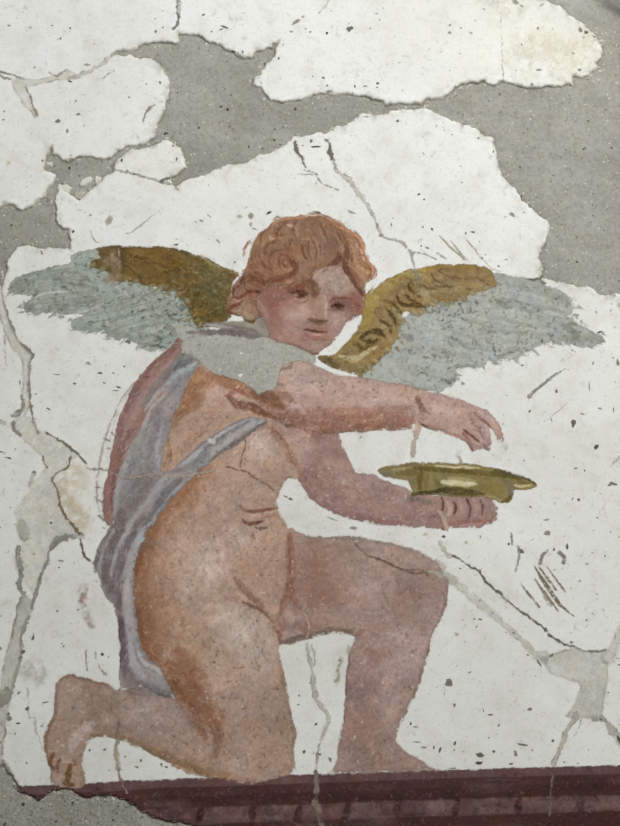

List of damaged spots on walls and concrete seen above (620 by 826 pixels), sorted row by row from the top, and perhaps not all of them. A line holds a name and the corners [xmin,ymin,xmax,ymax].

crack [0,56,112,117]
spalling [0,0,620,307]
crack [293,140,436,285]
spalling [170,324,316,395]
crack [169,437,274,490]
crack [411,396,425,457]
crack [0,286,146,794]
crack [355,501,620,664]
crack [546,711,620,826]